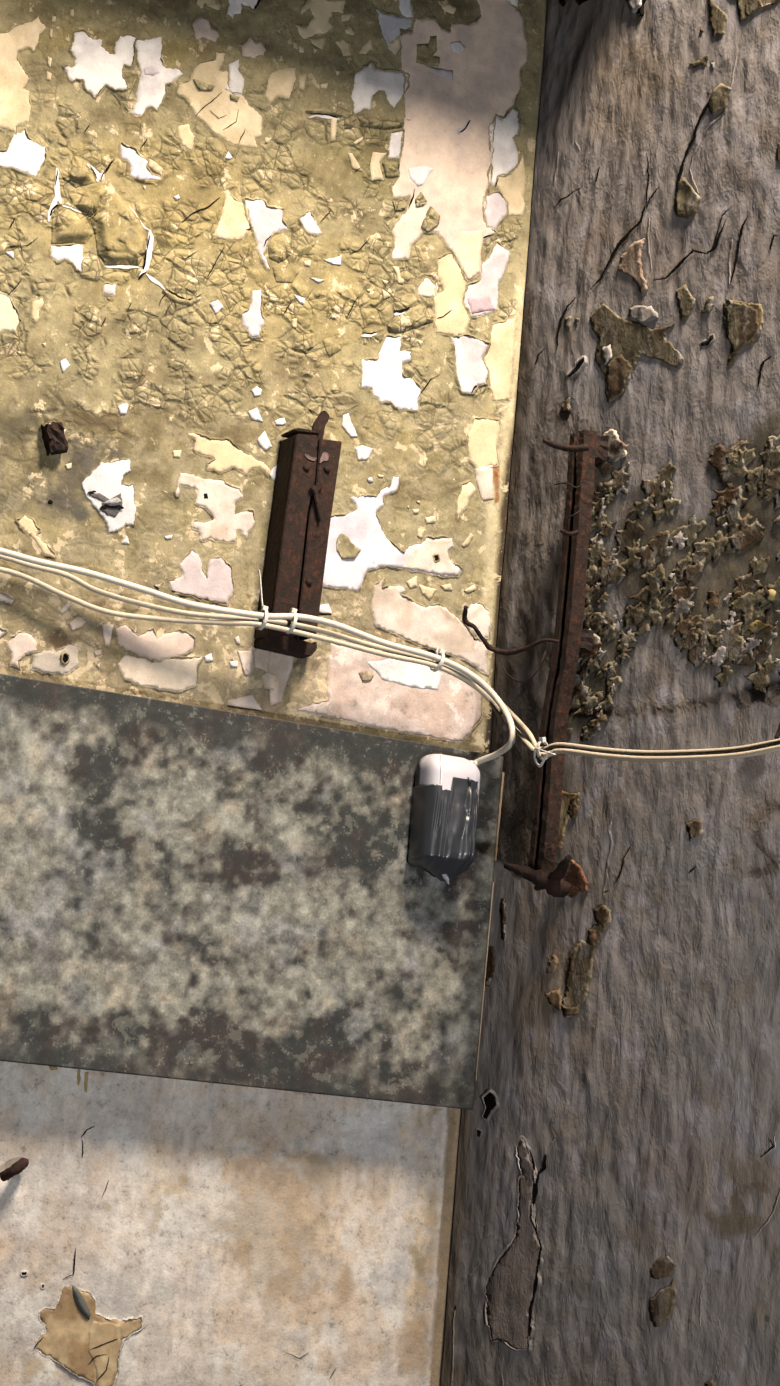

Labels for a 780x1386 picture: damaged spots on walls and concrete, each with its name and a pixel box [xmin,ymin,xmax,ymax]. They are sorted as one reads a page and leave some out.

flaking render [626,0,646,17]
peeling [700,0,779,39]
crack [196,92,245,145]
crack [306,108,343,119]
crack [8,125,271,327]
peeling [0,0,530,744]
crack [347,297,451,337]
peeling [564,238,764,403]
peeling [566,414,780,742]
peeling [557,790,588,898]
peeling [545,905,611,1018]
peeling [33,1285,144,1386]